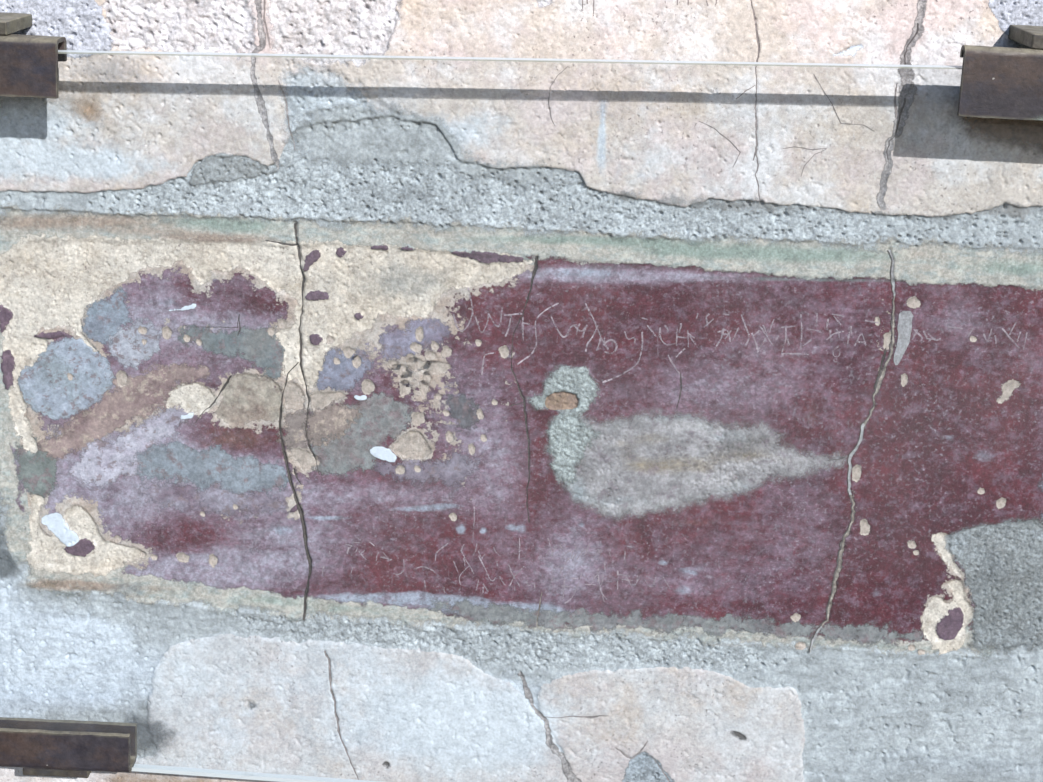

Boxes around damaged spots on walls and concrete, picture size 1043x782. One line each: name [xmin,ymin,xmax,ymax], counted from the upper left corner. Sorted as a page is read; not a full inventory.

flaking render [102,0,402,140]
crack [251,0,295,169]
crack [699,0,760,199]
crack [814,0,938,210]
peeling [26,494,158,577]
peeling [176,552,190,563]
peeling [0,232,535,518]
crack [266,223,320,622]
crack [809,249,896,653]
peeling [908,532,974,655]
crack [324,651,359,780]
crack [517,672,608,782]